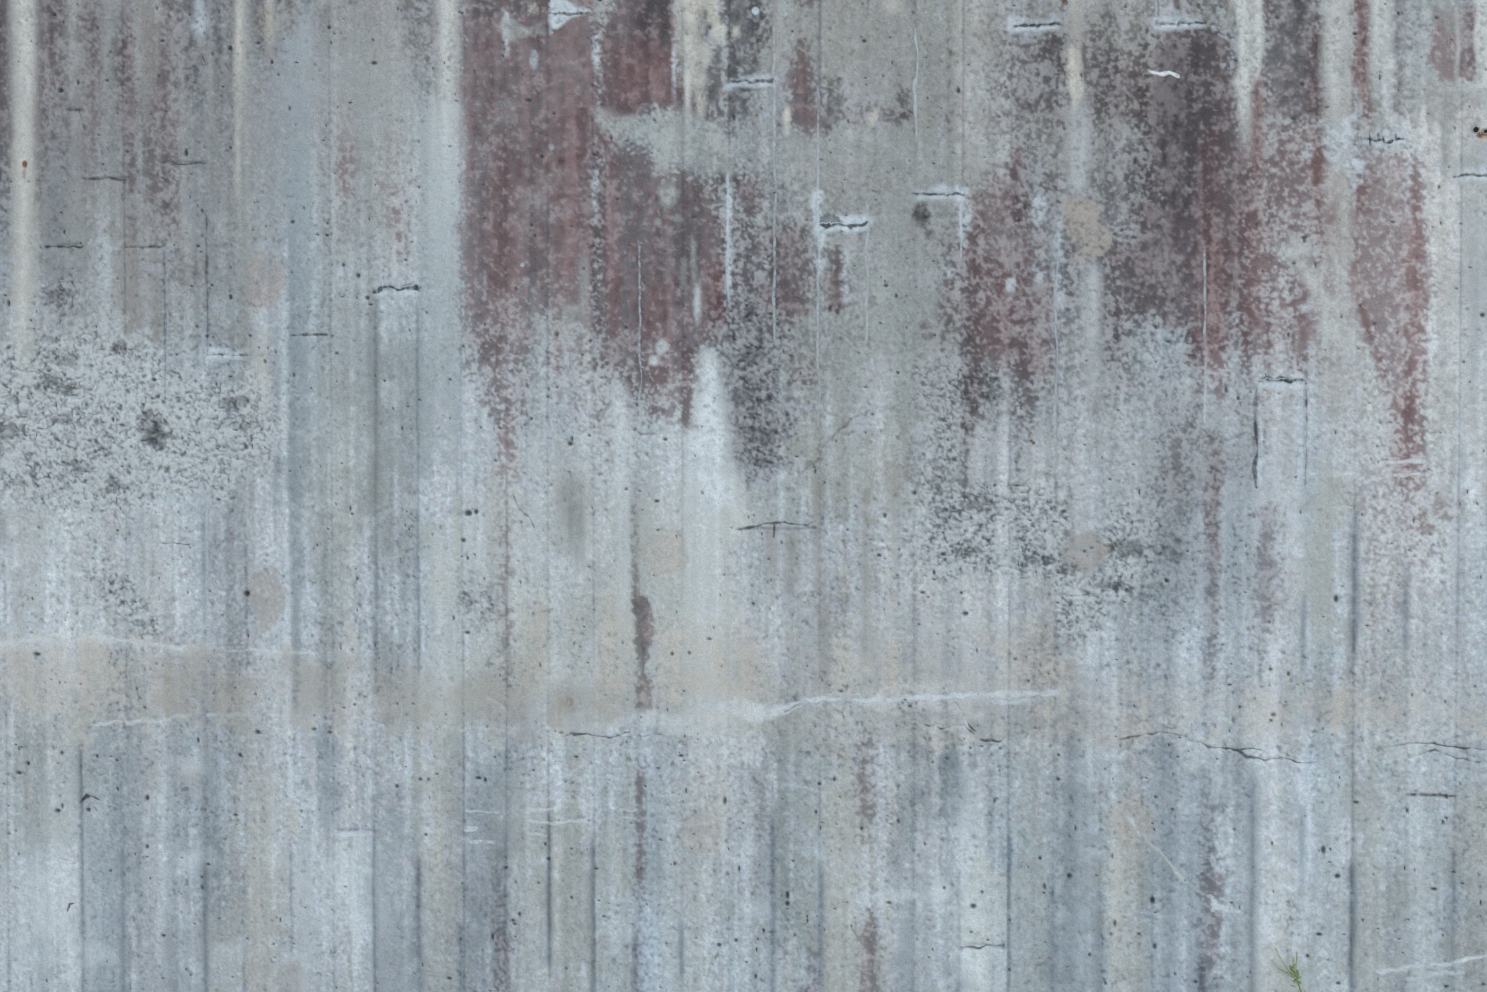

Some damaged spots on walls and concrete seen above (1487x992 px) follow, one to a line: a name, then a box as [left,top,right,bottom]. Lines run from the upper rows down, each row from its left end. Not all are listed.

corrosion [1475,127,1487,148]
crack [924,700,1003,743]
crack [1117,726,1317,764]